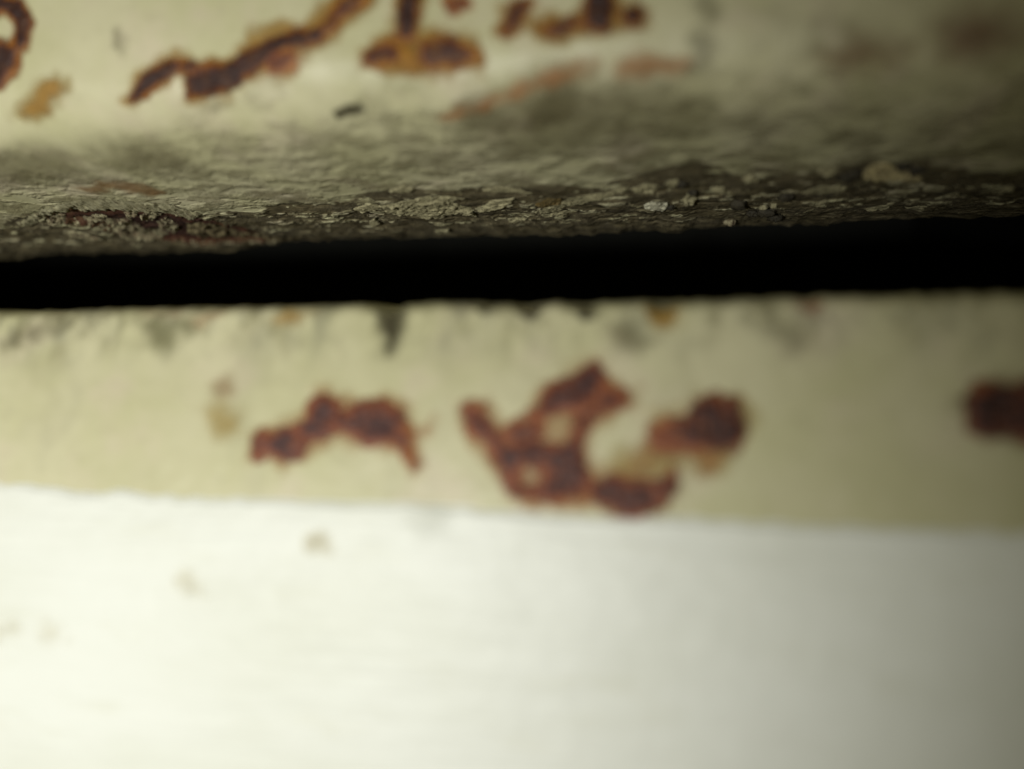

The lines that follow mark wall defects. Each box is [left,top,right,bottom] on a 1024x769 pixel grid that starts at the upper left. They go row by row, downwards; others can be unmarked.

rust [0,0,35,90]
rust [123,0,372,104]
rust [362,0,485,74]
rust [495,0,646,44]
peeling [16,199,333,246]
peeling [354,178,698,234]
peeling [711,162,928,227]
rust [250,393,422,472]
rust [460,359,748,520]
rust [962,379,1024,444]